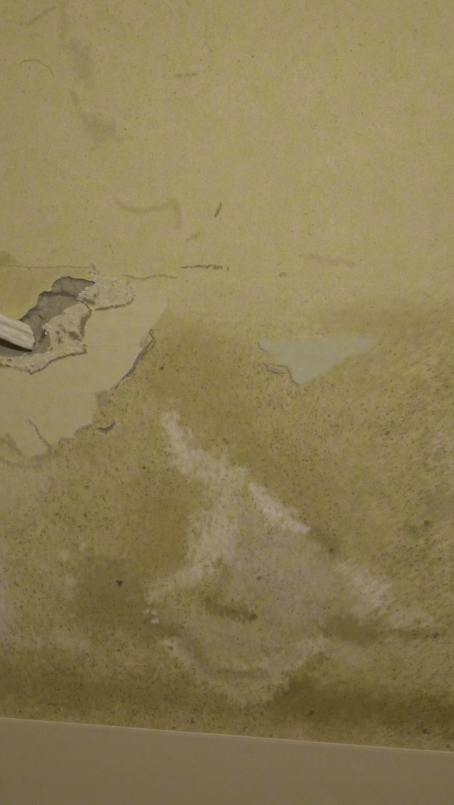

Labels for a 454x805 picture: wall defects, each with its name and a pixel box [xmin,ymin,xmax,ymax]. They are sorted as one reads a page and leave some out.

leakage [0,248,92,315]
leakage [297,289,454,350]
peeling [252,331,382,390]
peeling [0,273,173,522]
leakage [0,309,454,749]